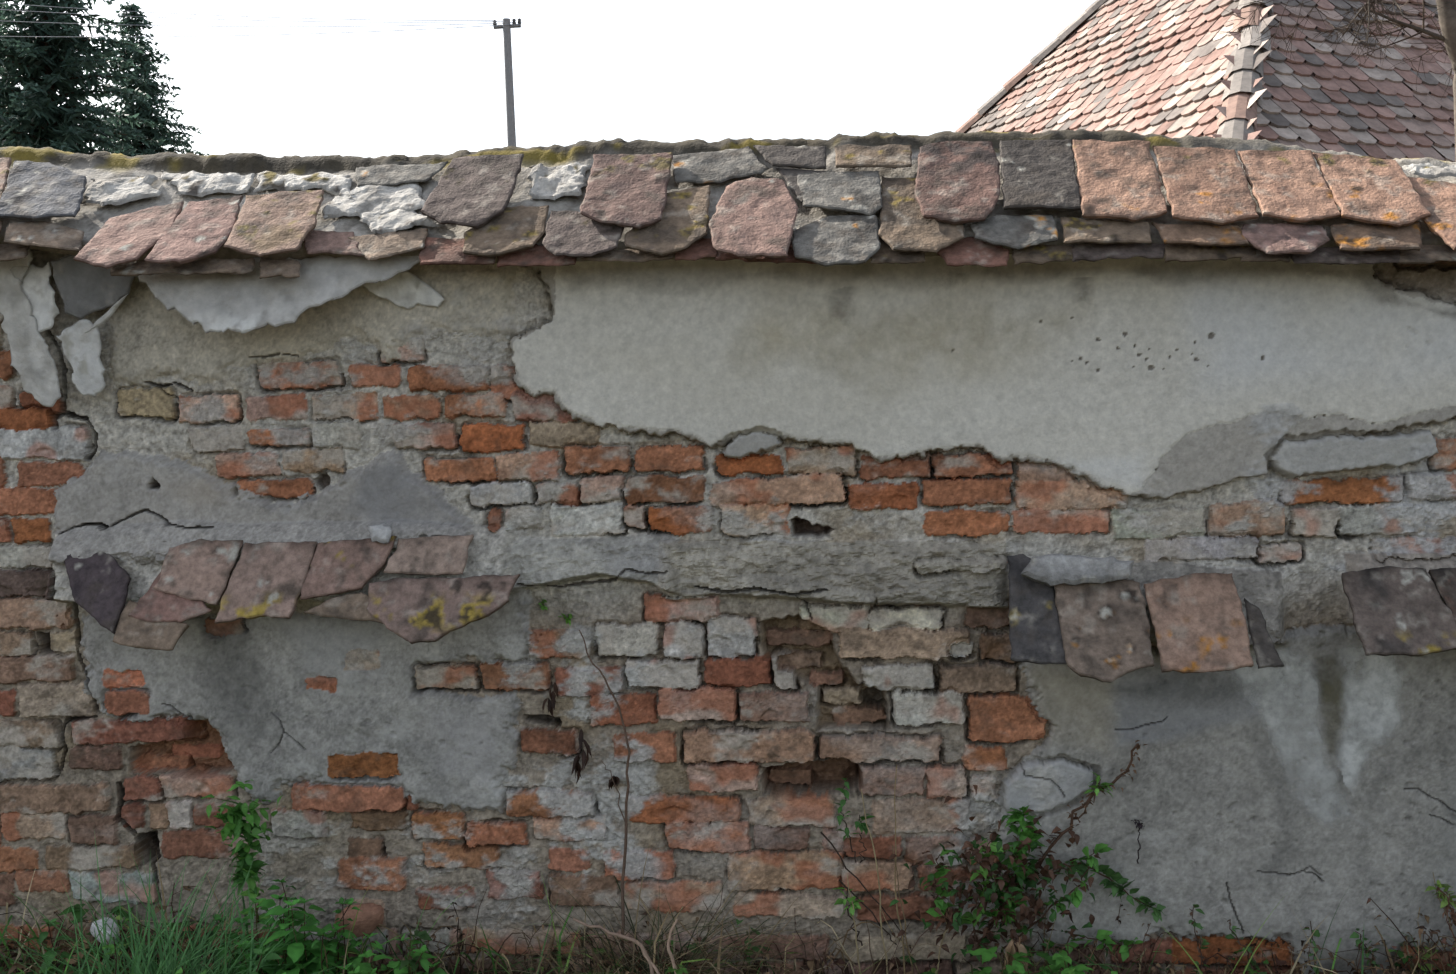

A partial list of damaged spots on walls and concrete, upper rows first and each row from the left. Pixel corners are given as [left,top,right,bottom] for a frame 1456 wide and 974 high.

crack [61,508,215,533]
spalling [0,249,1456,953]
damp [1236,649,1400,821]
spalling [1156,931,1301,974]